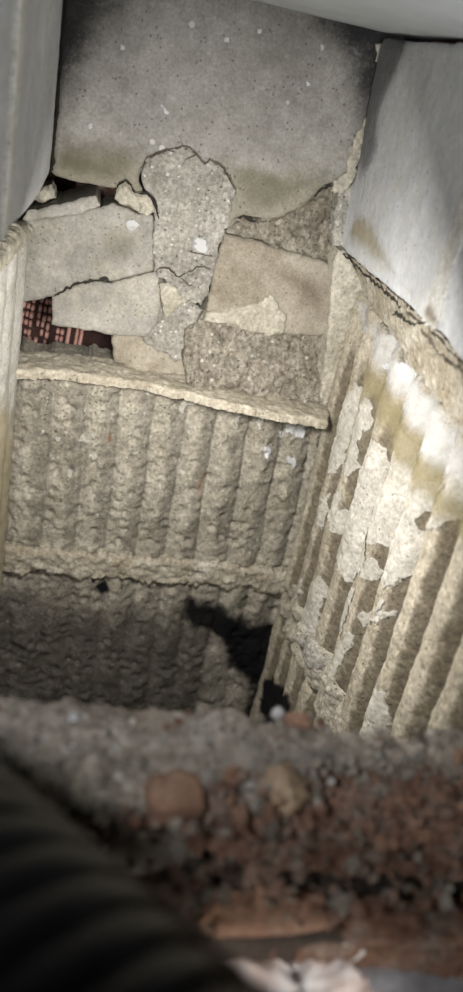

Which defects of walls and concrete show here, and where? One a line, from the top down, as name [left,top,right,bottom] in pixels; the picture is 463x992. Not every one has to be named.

crack [114,137,236,219]
crack [235,184,332,223]
crack [54,251,213,315]
crack [343,254,463,372]
peeling [382,362,417,378]
peeling [316,382,463,678]
peeling [293,575,329,634]
peeling [360,683,393,739]